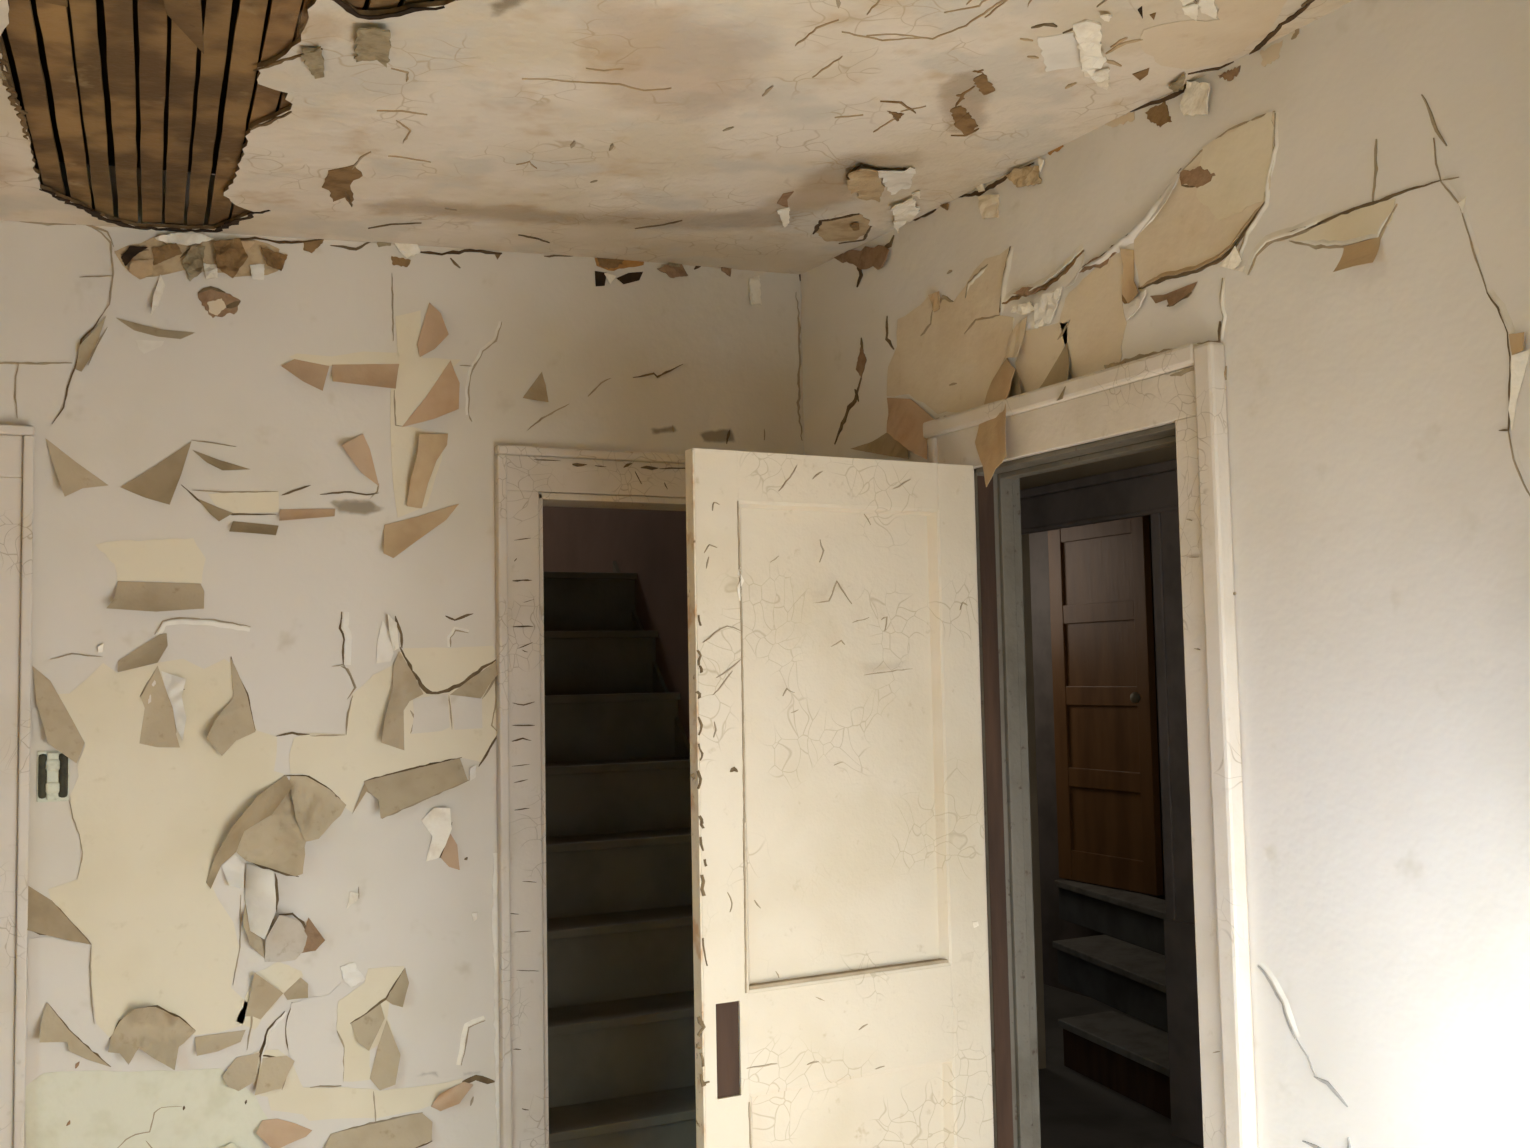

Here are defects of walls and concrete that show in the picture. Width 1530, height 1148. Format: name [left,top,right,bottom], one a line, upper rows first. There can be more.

crack [0,221,194,424]
flaking render [0,0,324,318]
flaking render [322,151,371,207]
crack [228,222,572,268]
peeling [384,302,462,558]
crack [795,0,1032,78]
flaking render [813,145,1064,287]
peeling [885,111,1275,414]
crack [1105,0,1315,127]
crack [1104,112,1332,380]
crack [1421,94,1530,496]
peeling [25,612,498,1148]